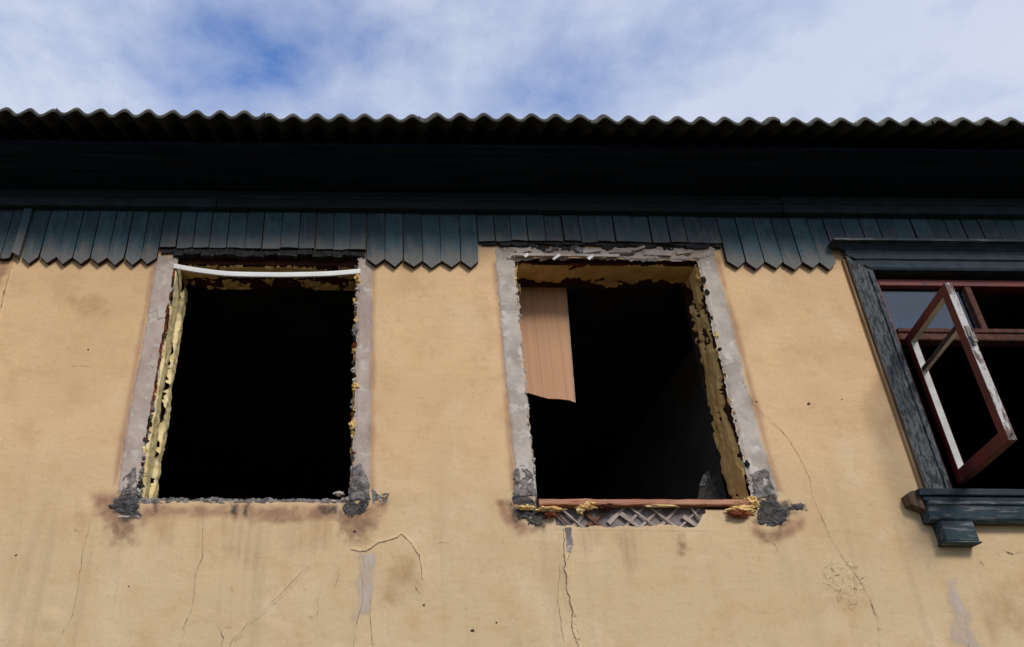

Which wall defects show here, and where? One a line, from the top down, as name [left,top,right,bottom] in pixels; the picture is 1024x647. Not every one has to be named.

flaking render [117,256,178,492]
flaking render [495,245,779,497]
crack [335,531,442,646]
crack [557,525,582,647]
crack [745,387,881,645]